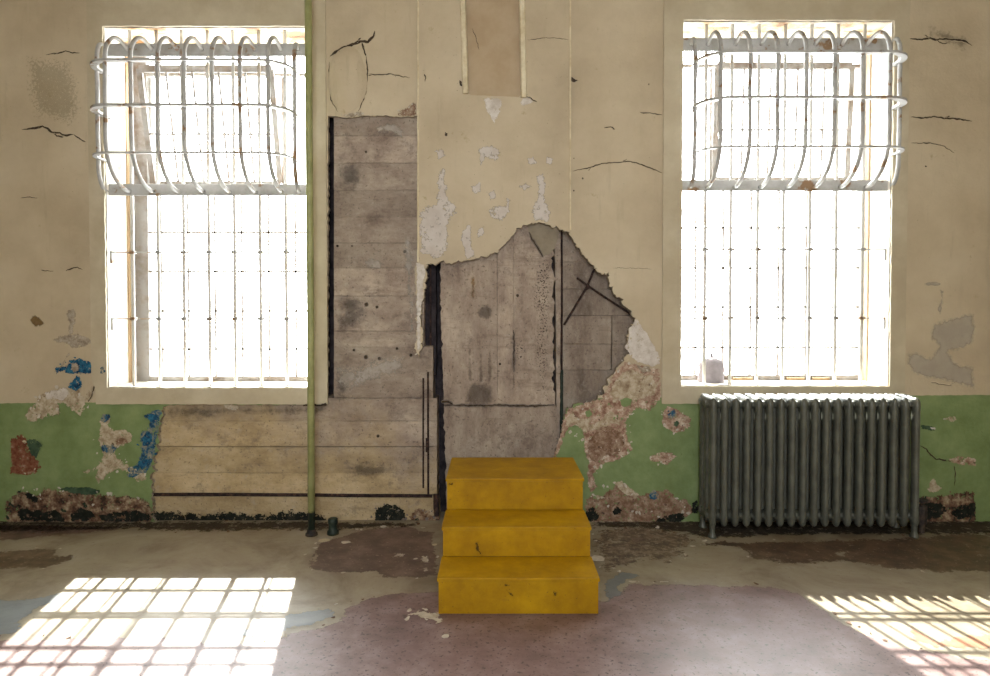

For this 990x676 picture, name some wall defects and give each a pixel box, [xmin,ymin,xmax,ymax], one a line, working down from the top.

crack [910,35,972,46]
crack [328,31,427,112]
peeling [484,97,502,123]
crack [22,125,86,142]
crack [911,115,972,153]
crack [573,159,662,173]
spalling [309,103,990,579]
peeling [25,309,106,425]
spalling [0,404,308,541]